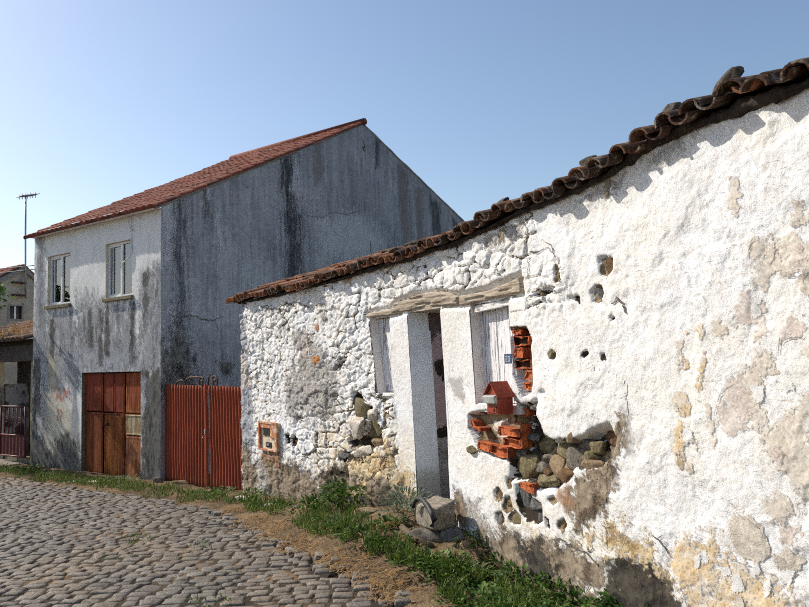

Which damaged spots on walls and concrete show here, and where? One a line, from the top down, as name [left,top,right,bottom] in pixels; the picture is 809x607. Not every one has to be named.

water stain [278,152,393,279]
water stain [430,196,441,236]
peeling [726,175,743,218]
water stain [31,199,206,480]
water stain [216,353,416,509]
spalling [337,392,388,471]
spalling [466,326,617,532]
water stain [451,478,680,607]
water stain [555,454,613,526]
peeling [657,199,809,607]